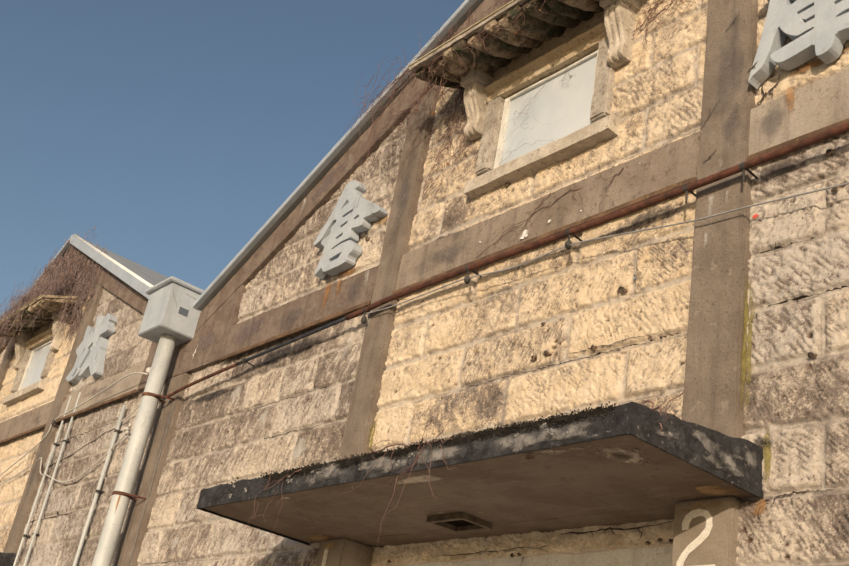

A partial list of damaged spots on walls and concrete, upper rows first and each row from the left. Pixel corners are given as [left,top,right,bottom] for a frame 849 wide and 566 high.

damp [432,421,533,448]
damp [337,446,420,468]
crack [437,521,673,556]